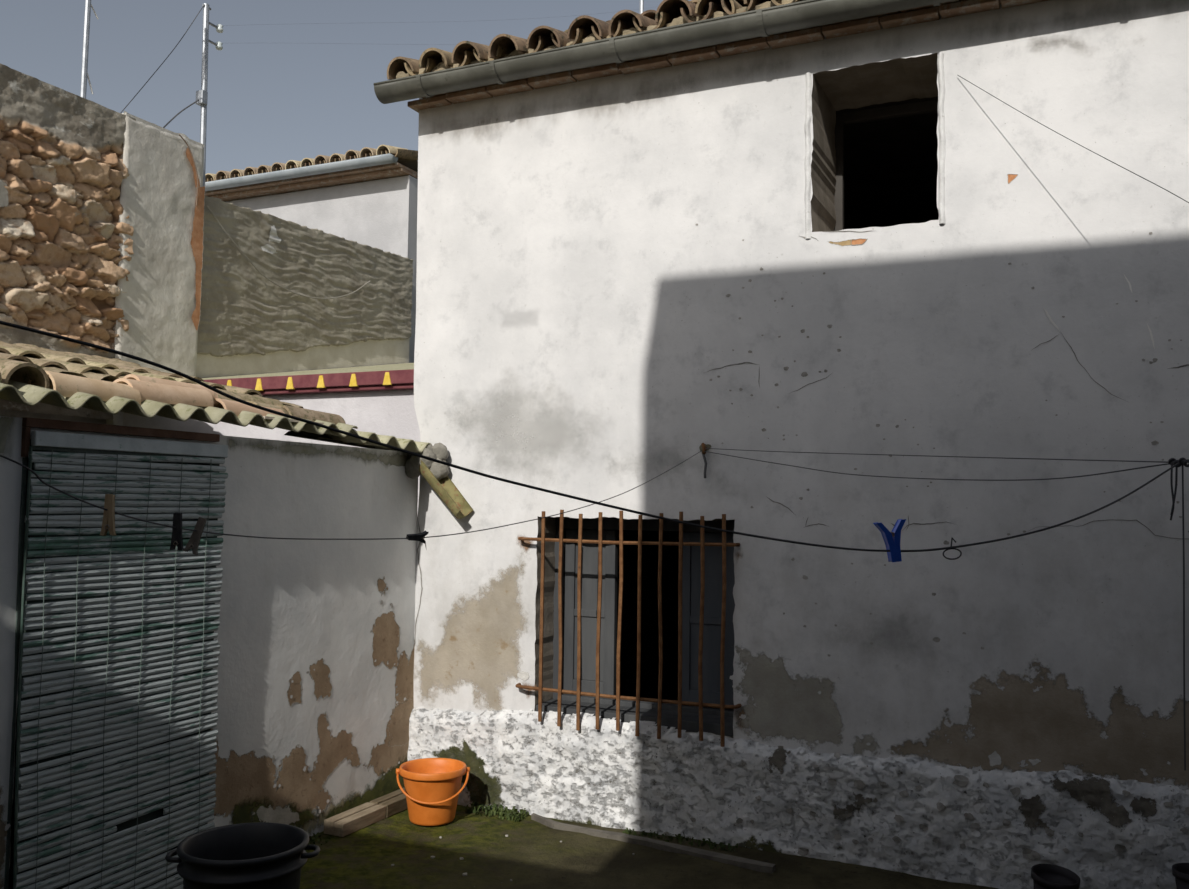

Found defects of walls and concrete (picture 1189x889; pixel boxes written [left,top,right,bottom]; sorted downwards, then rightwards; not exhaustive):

peeling [208,577,415,825]
flaking render [730,646,1189,852]